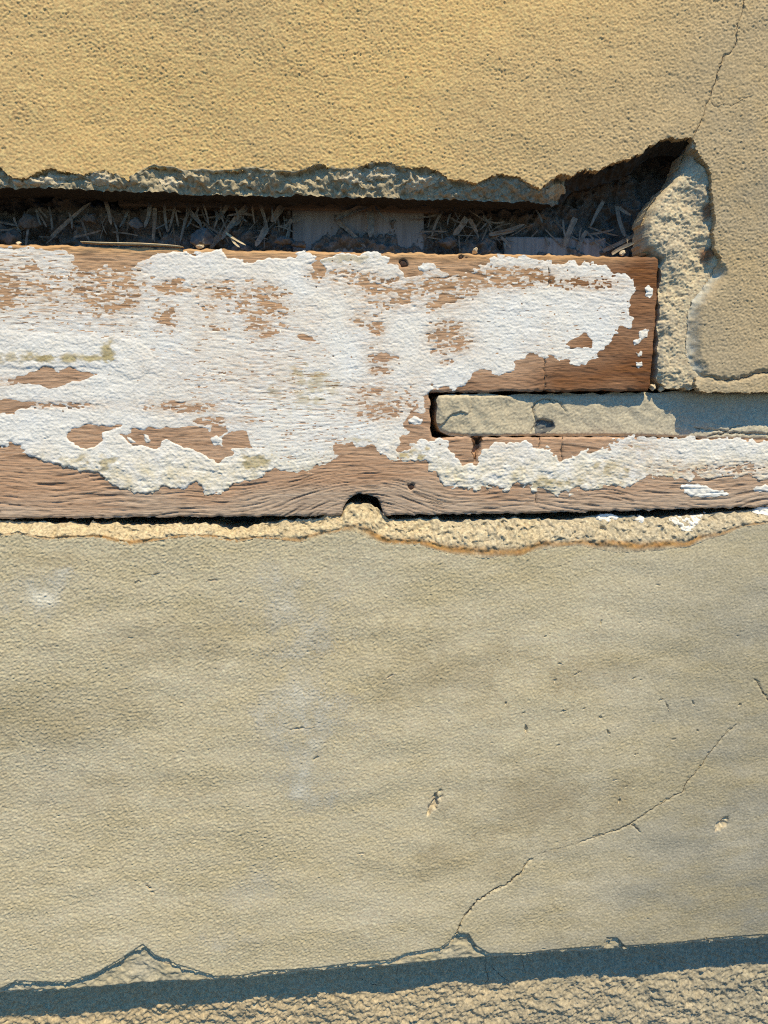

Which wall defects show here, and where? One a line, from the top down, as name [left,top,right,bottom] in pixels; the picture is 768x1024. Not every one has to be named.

crack [692,0,749,139]
peeling [0,139,768,558]
crack [456,726,734,933]